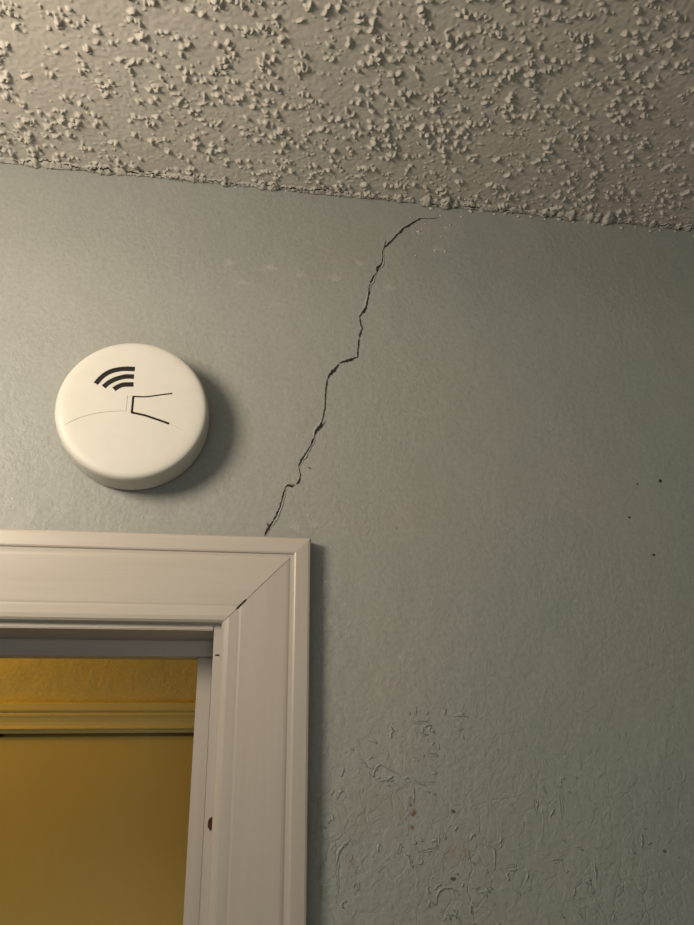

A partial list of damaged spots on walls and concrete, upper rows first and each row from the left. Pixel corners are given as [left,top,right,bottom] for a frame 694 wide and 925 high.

crack [264,200,567,536]